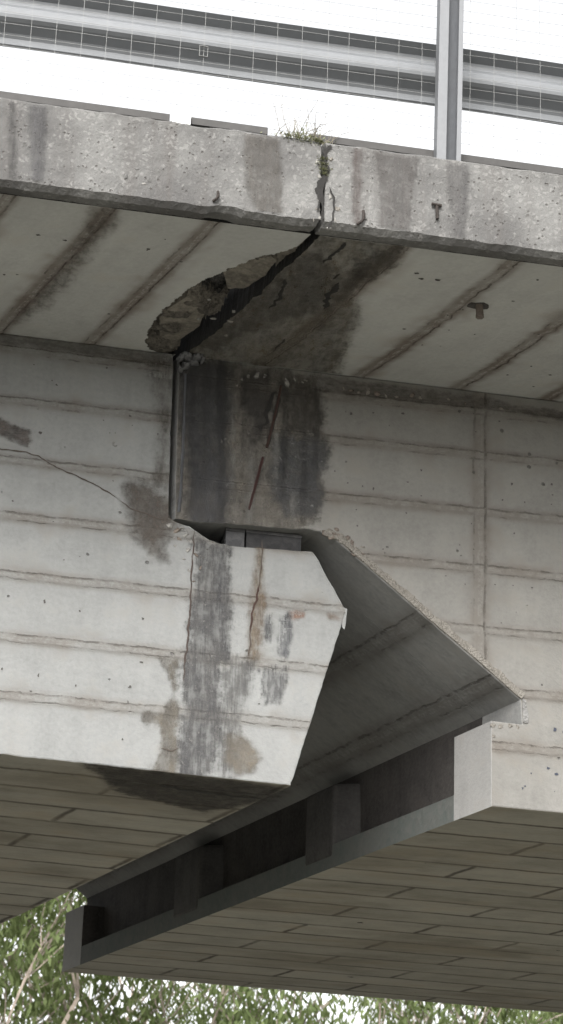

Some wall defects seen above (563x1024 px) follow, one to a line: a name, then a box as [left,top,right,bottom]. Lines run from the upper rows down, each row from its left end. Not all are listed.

crack [315,145,346,309]
spalling [144,241,304,373]
leakage [125,236,552,558]
crack [0,449,165,520]
crack [183,535,195,681]
leakage [88,541,292,811]
crack [248,543,263,655]